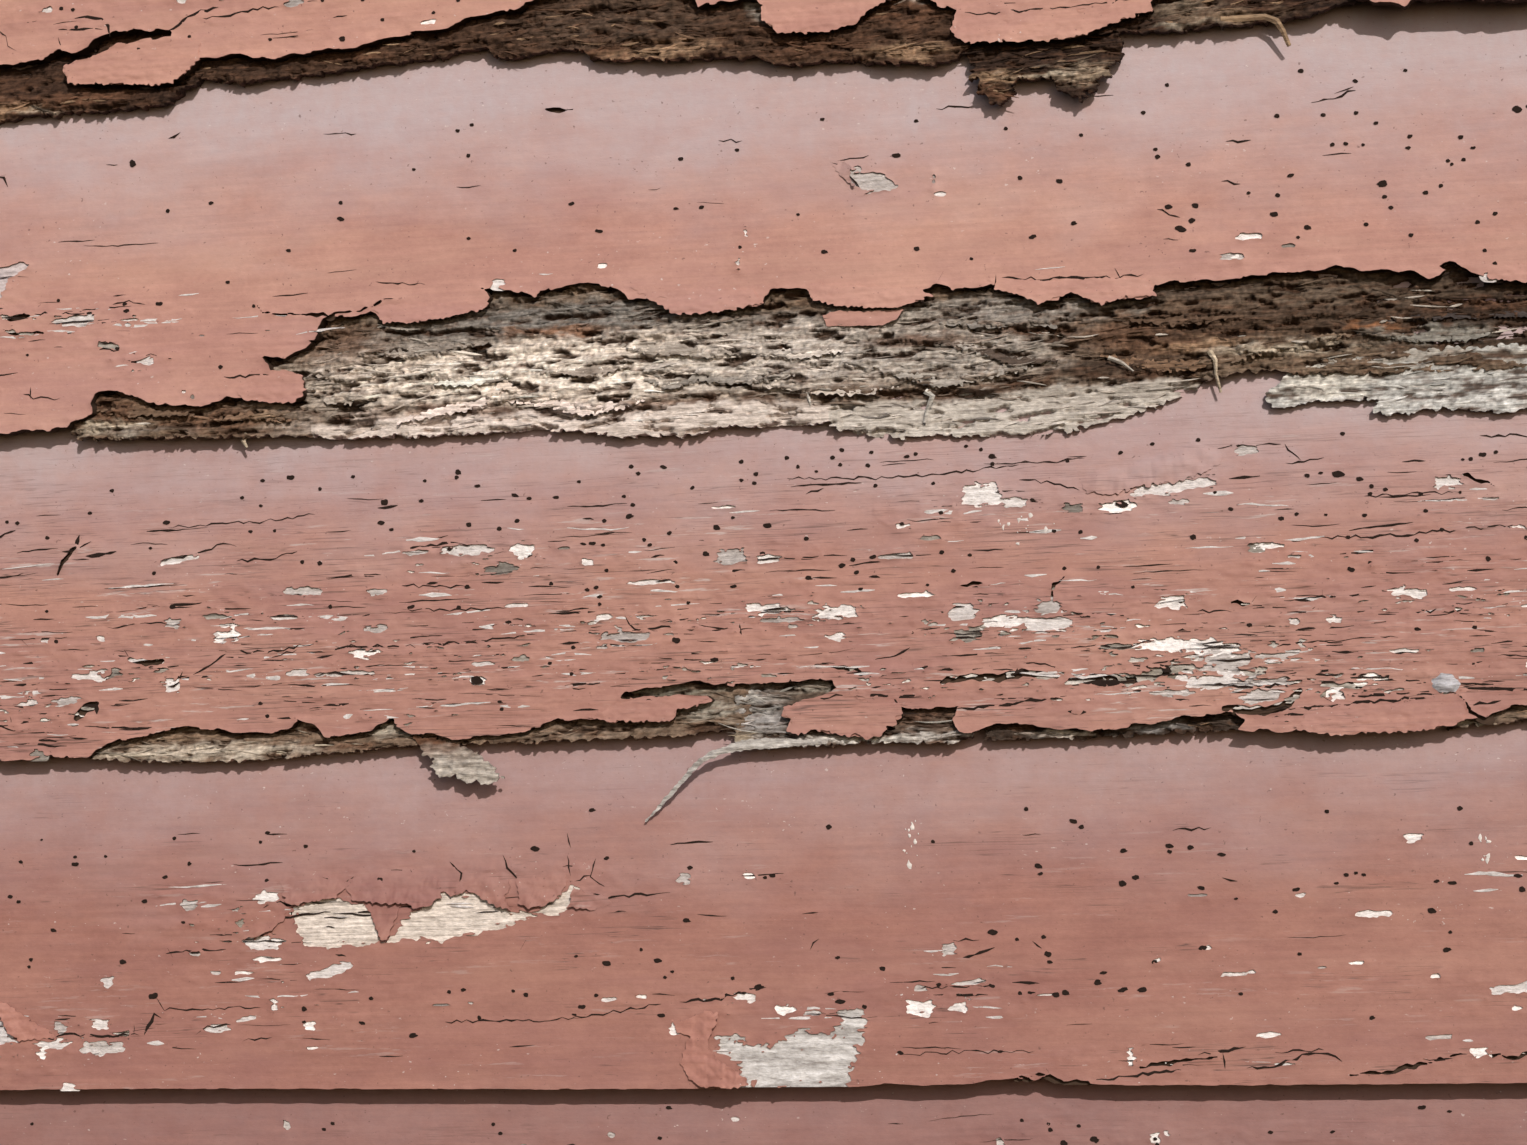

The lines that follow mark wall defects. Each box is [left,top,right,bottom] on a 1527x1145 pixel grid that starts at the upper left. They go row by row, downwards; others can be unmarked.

peeling [761,0,886,35]
peeling [950,2,1153,44]
peeling [63,36,201,86]
peeling [372,279,506,324]
peeling [806,281,934,327]
peeling [984,274,1157,306]
peeling [236,372,307,404]
peeling [588,651,791,723]
peeling [781,587,1465,740]
peeling [404,714,505,785]
peeling [210,862,611,980]
peeling [669,993,868,1089]